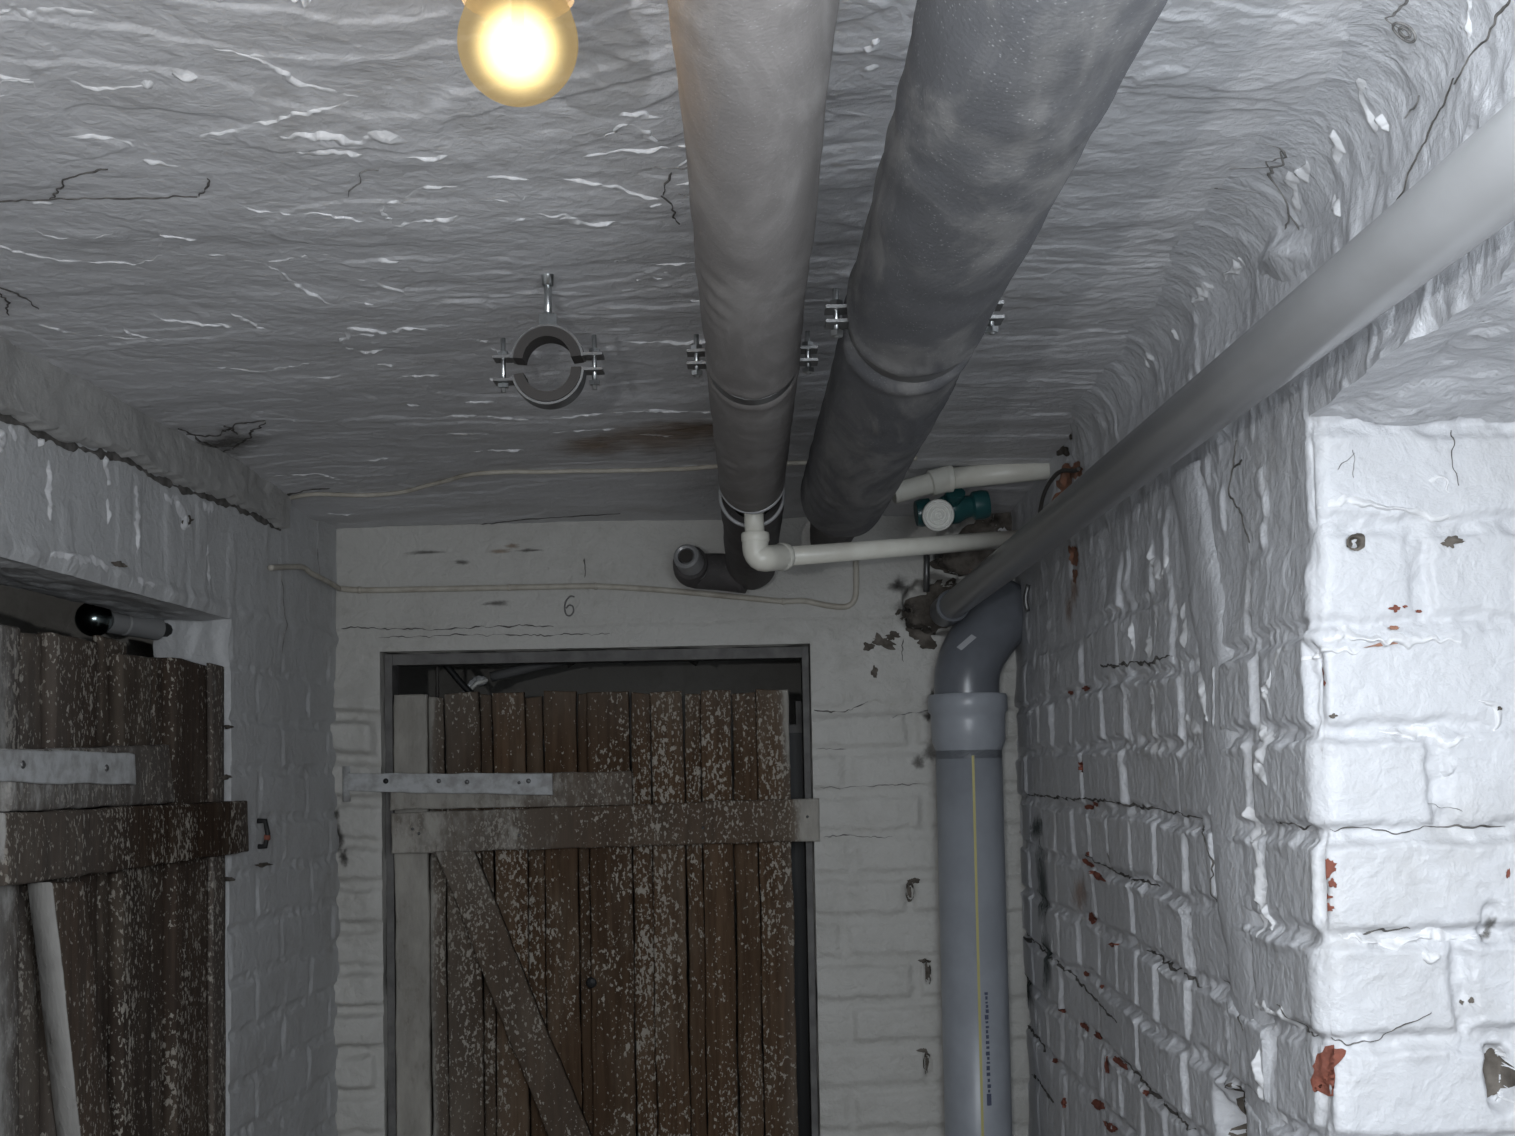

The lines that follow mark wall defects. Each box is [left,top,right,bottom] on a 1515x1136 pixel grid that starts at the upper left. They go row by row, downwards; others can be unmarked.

crack [1396,0,1511,200]
crack [0,168,210,203]
crack [1214,143,1300,230]
leakage [444,401,711,452]
crack [0,413,330,531]
spalling [863,512,1012,678]
leakage [1038,853,1049,915]
crack [1027,793,1217,902]
spalling [1325,858,1337,912]
leakage [1027,940,1053,1001]
crack [1023,933,1196,1131]
spalling [1310,1032,1346,1096]